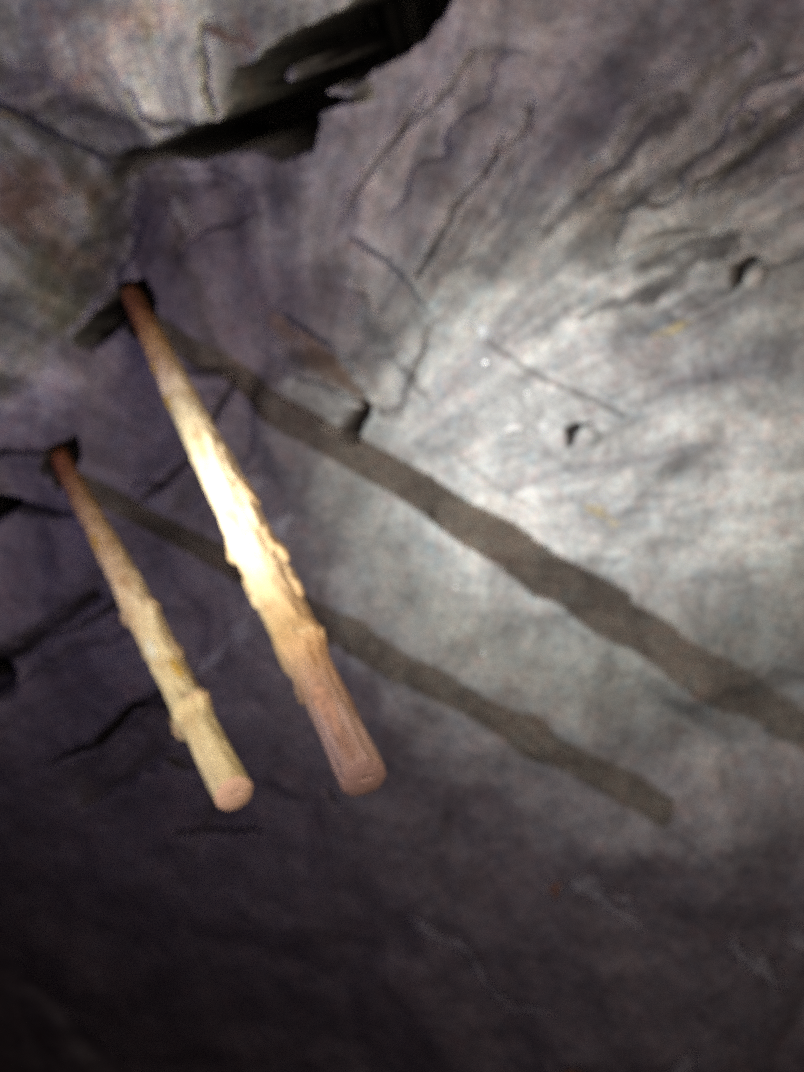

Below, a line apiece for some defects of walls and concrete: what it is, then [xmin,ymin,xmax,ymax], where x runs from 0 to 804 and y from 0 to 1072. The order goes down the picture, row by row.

crack [202,22,418,135]
crack [0,493,71,516]
crack [0,595,101,691]